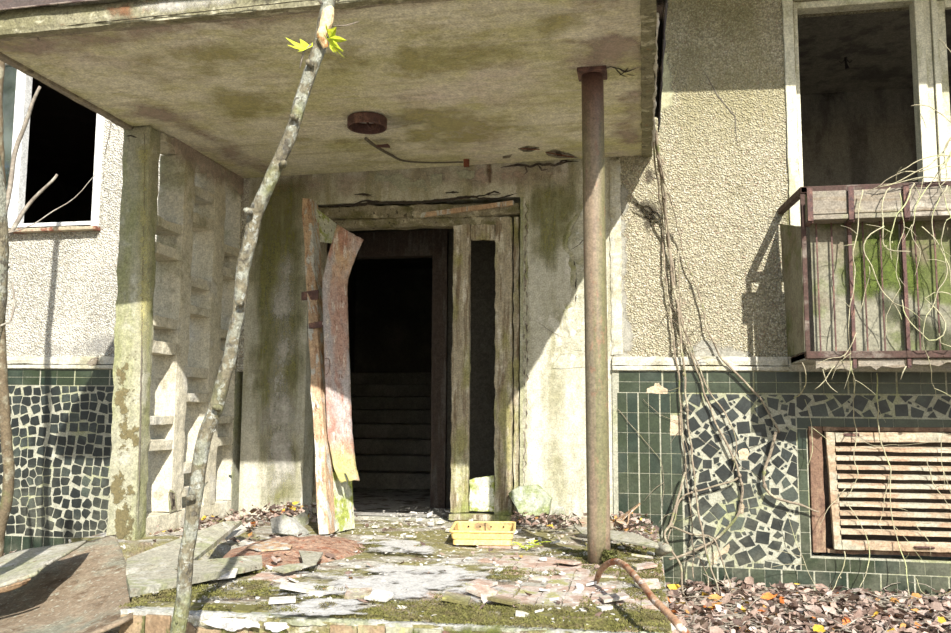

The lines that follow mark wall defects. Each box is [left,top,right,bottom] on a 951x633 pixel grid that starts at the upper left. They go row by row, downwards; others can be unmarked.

crack [327,160,578,207]